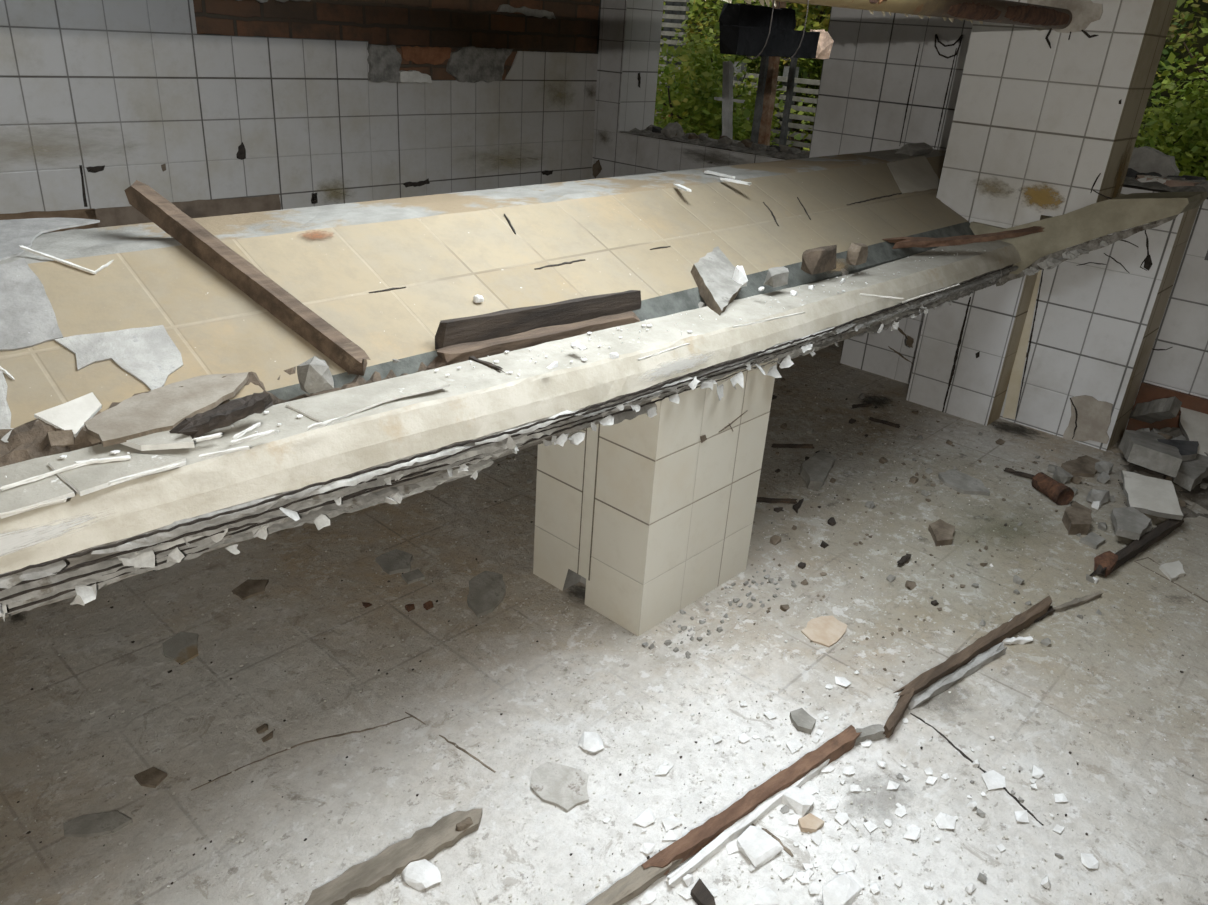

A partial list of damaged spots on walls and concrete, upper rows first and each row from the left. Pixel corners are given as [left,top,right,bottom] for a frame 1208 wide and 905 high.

flaking render [193,0,600,83]
spalling [1027,0,1103,49]
peeling [171,194,281,218]
spalling [403,178,430,188]
leakage [1024,185,1063,209]
peeling [0,214,1179,620]
peeling [250,578,891,823]
crack [910,713,1044,826]
peeling [801,753,1114,905]